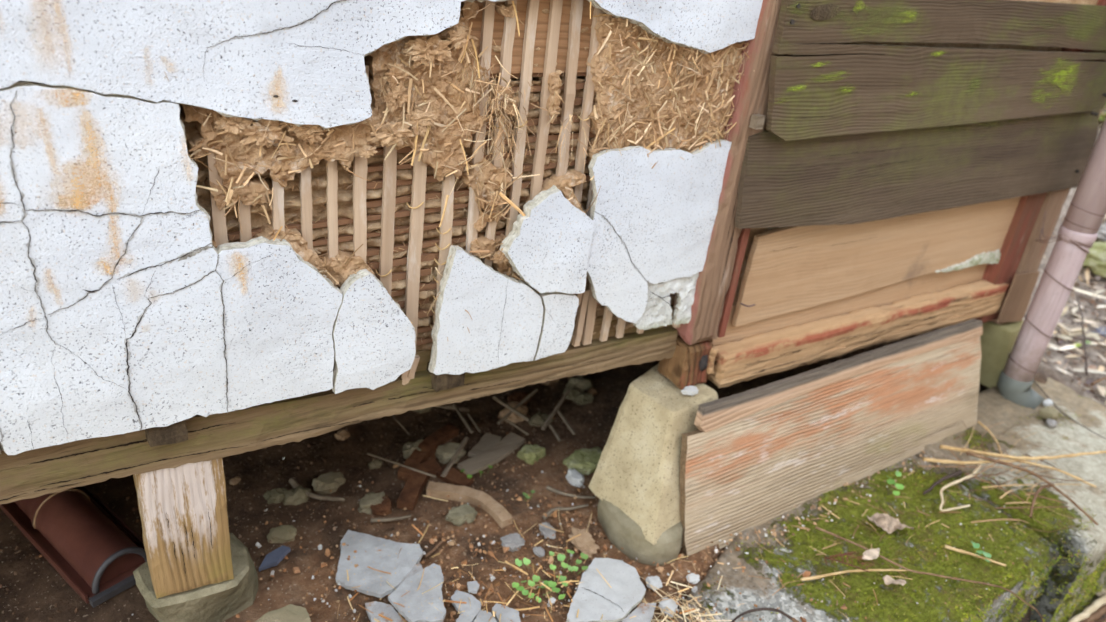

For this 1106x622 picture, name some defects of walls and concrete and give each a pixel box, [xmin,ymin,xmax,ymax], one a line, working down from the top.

crack [0,81,270,431]
crack [203,0,363,80]
spalling [179,1,750,349]
crack [593,211,678,310]